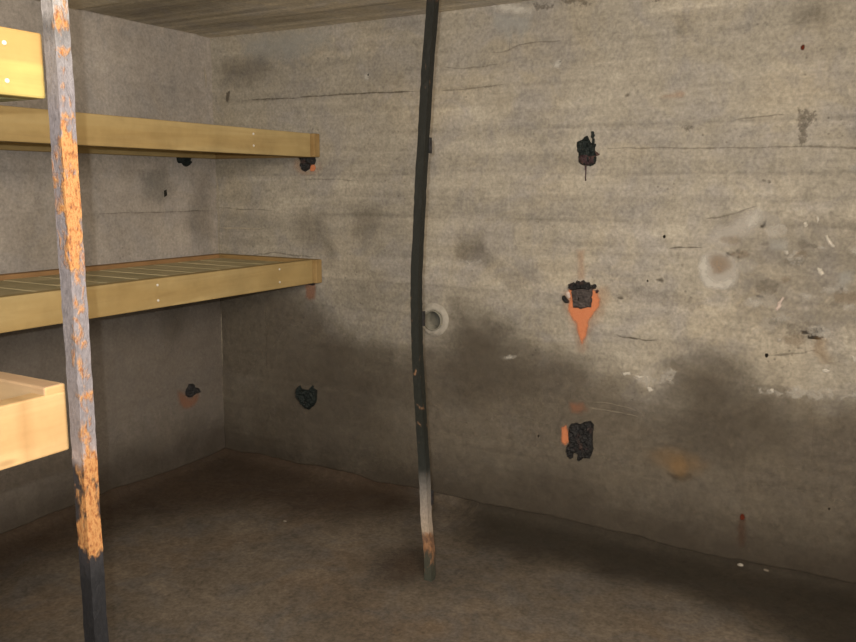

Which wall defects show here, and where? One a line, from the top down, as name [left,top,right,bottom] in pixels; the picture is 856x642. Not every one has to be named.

peeling [579,155,596,166]
leakage [0,331,66,381]
leakage [92,291,420,522]
corrosion [569,290,599,343]
leakage [0,453,77,562]
leakage [423,331,856,642]